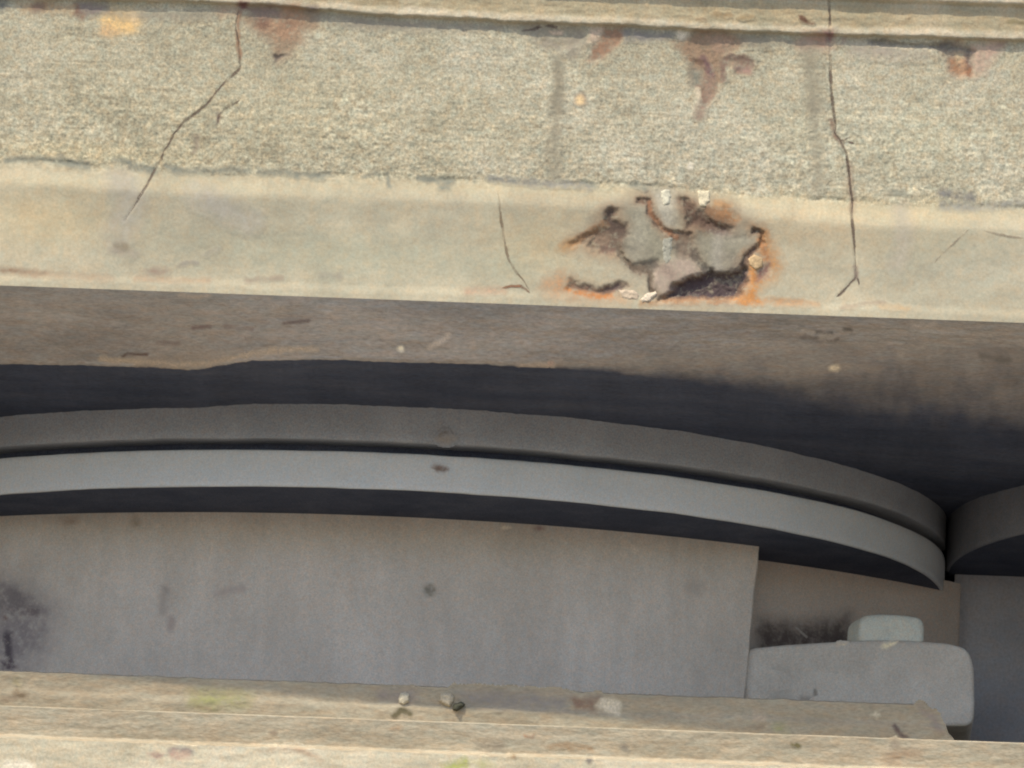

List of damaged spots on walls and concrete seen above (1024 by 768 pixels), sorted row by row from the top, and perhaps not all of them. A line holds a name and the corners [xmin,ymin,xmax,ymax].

crack [127,0,251,217]
crack [500,212,530,293]
spalling [534,161,805,313]
crack [828,69,860,297]